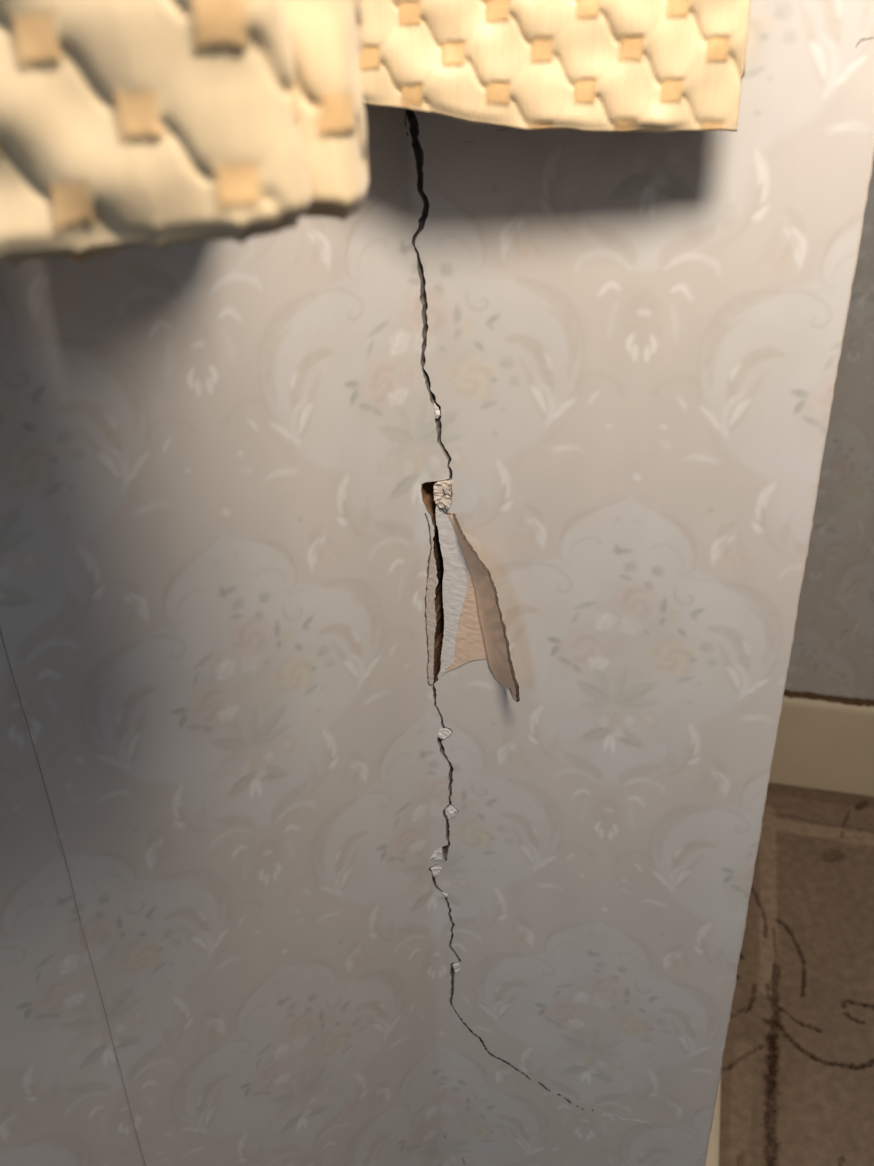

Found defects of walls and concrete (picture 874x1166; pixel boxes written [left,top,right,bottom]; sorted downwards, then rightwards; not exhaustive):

crack [405,109,651,1124]